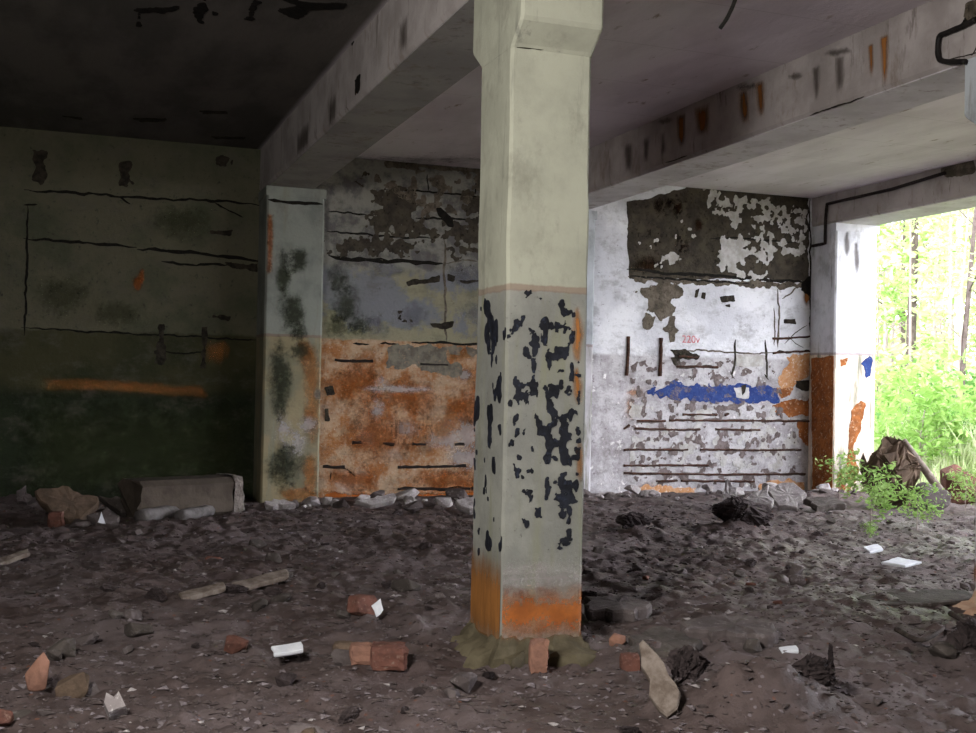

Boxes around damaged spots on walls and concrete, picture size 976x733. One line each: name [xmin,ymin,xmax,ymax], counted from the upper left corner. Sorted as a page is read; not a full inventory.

peeling [324,161,480,286]
leakage [268,250,316,490]
corrosion [283,458,377,500]
corrosion [336,359,476,460]
peeling [386,298,636,564]
peeling [623,187,866,493]
peeling [861,356,873,378]
spalling [183,504,471,646]
corrosion [470,557,582,639]
spalling [75,617,298,733]
spalling [301,674,443,733]